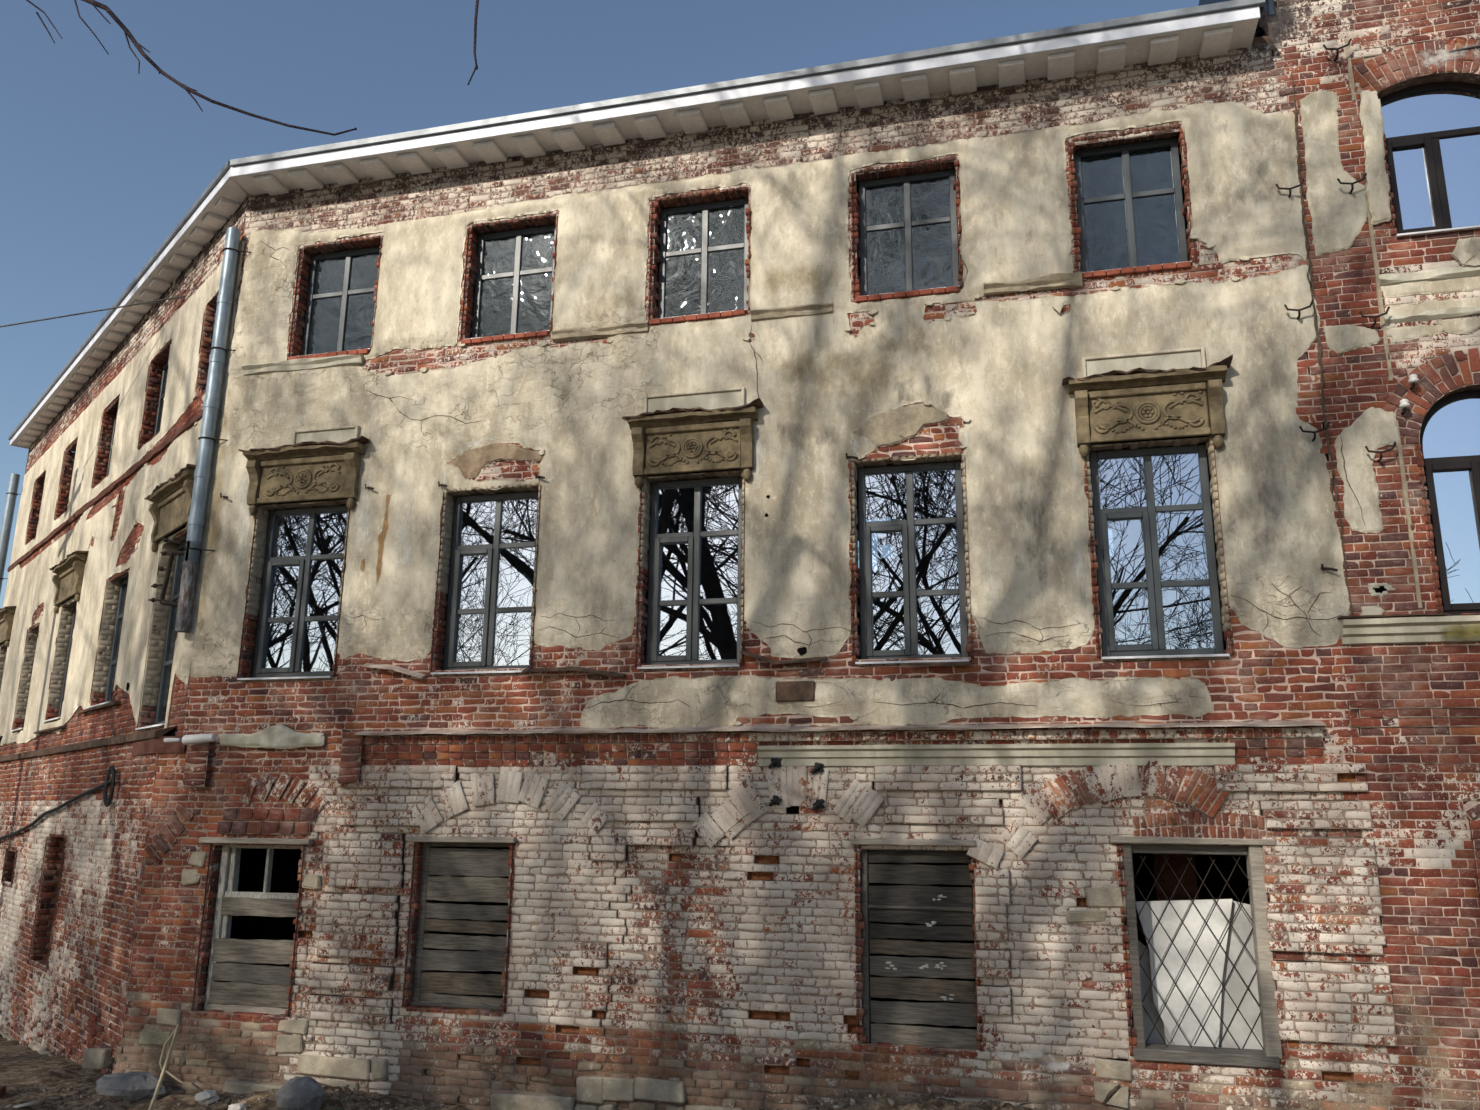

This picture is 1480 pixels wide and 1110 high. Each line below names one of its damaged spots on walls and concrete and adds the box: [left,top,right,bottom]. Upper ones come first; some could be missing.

spalling [845,300,878,337]
crack [1231,72,1365,637]
spalling [848,402,971,463]
corrosion [361,495,390,580]
crack [541,613,618,638]
crack [752,621,853,650]
crack [984,618,1080,645]
spalling [732,713,858,733]
spalling [747,855,779,880]
spalling [573,967,598,976]
spalling [556,1010,605,1034]
spalling [749,1010,791,1021]